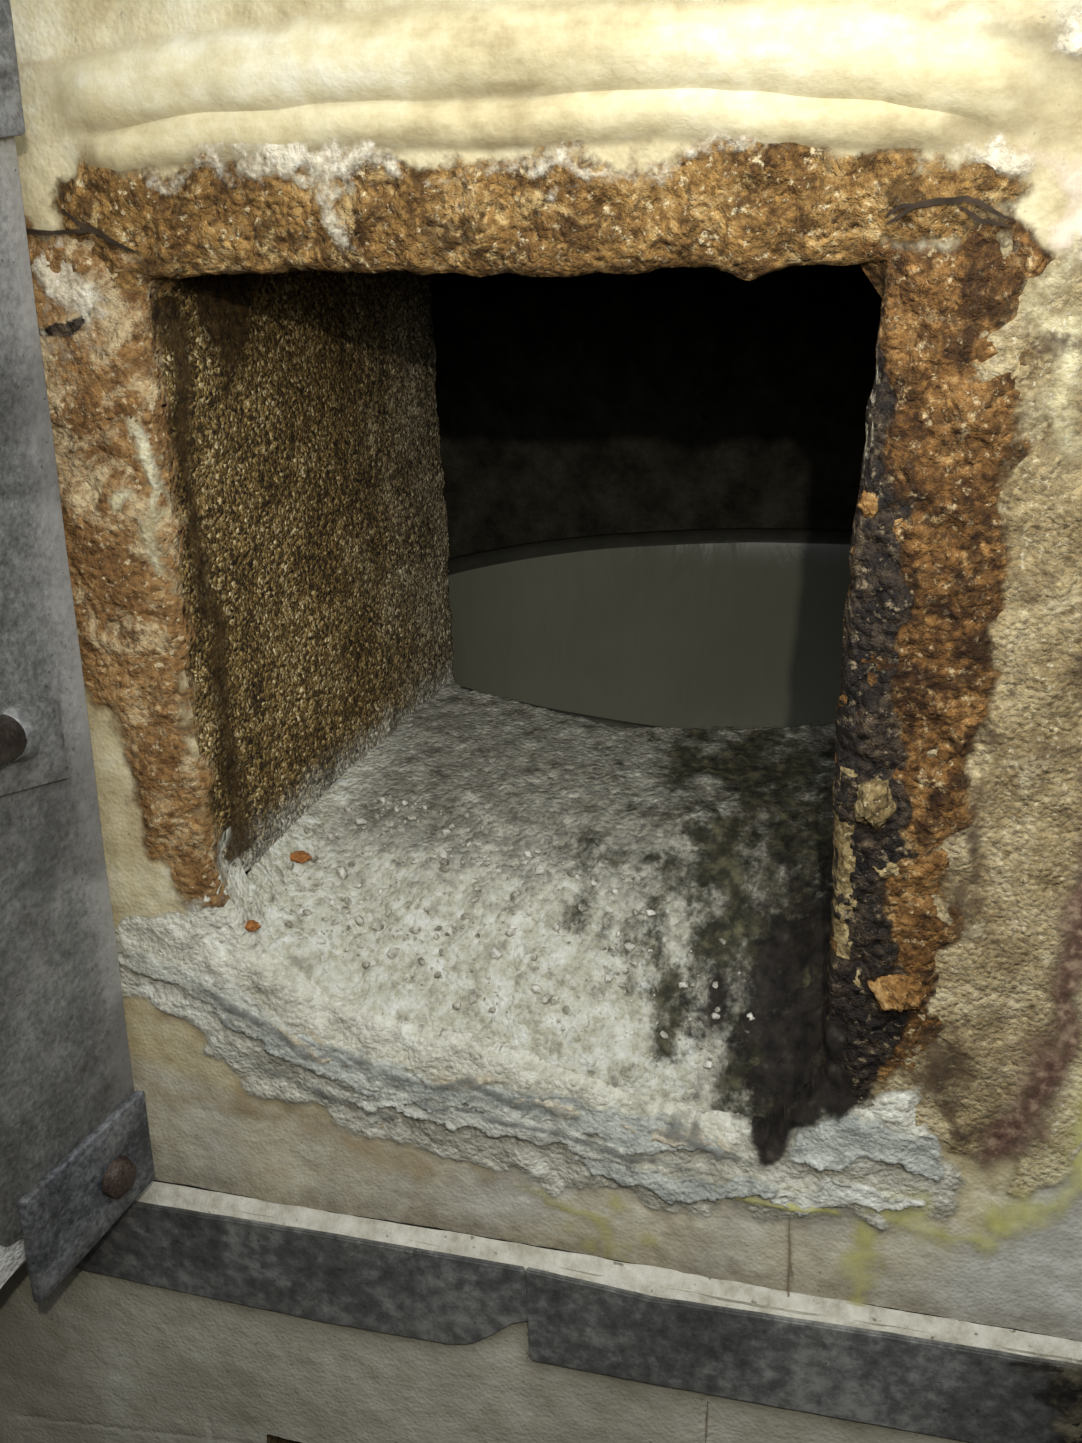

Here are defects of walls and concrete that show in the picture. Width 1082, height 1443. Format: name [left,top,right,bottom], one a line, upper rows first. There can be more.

spalling [24,134,1082,1232]
leakage [555,726,856,1165]